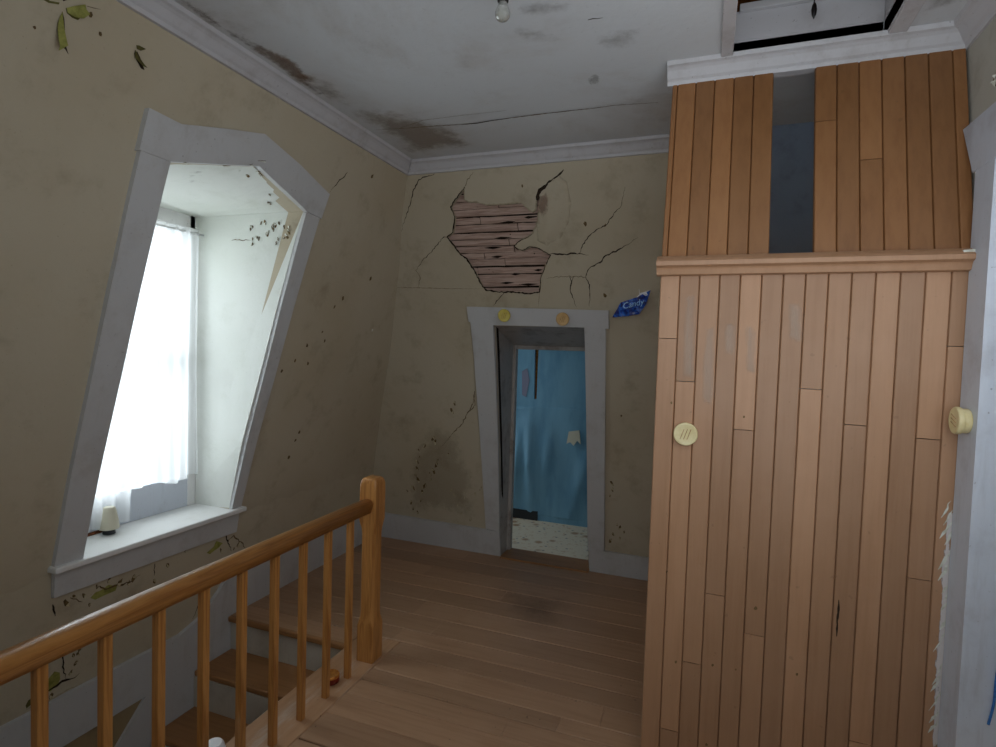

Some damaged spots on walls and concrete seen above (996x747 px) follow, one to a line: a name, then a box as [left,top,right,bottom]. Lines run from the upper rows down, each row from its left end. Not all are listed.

peeling [44,0,98,53]
peeling [134,45,147,70]
leakage [255,46,308,86]
crack [402,174,434,229]
crack [536,169,564,200]
flaking render [447,187,551,294]
crack [549,190,637,304]